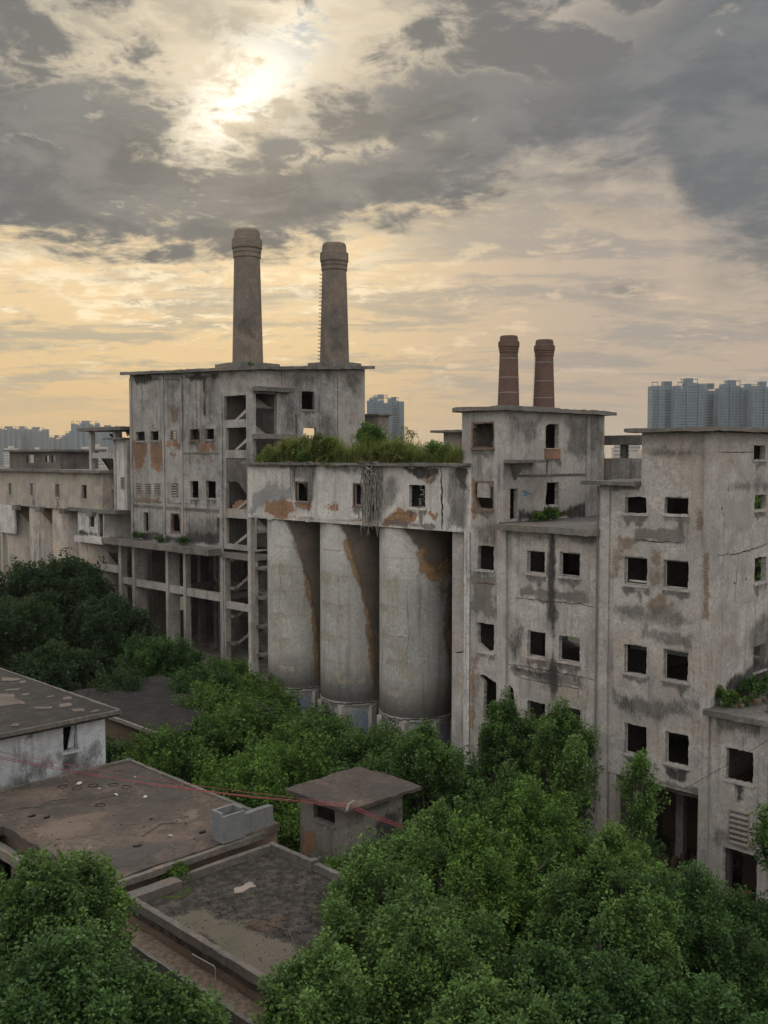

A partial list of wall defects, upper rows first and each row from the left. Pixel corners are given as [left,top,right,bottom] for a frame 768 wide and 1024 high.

flaking render [133,439,180,472]
flaking render [253,497,438,531]
corrosion [292,540,320,678]
corrosion [343,539,376,691]
corrosion [416,548,452,665]
damp [543,534,555,632]
damp [548,659,557,697]